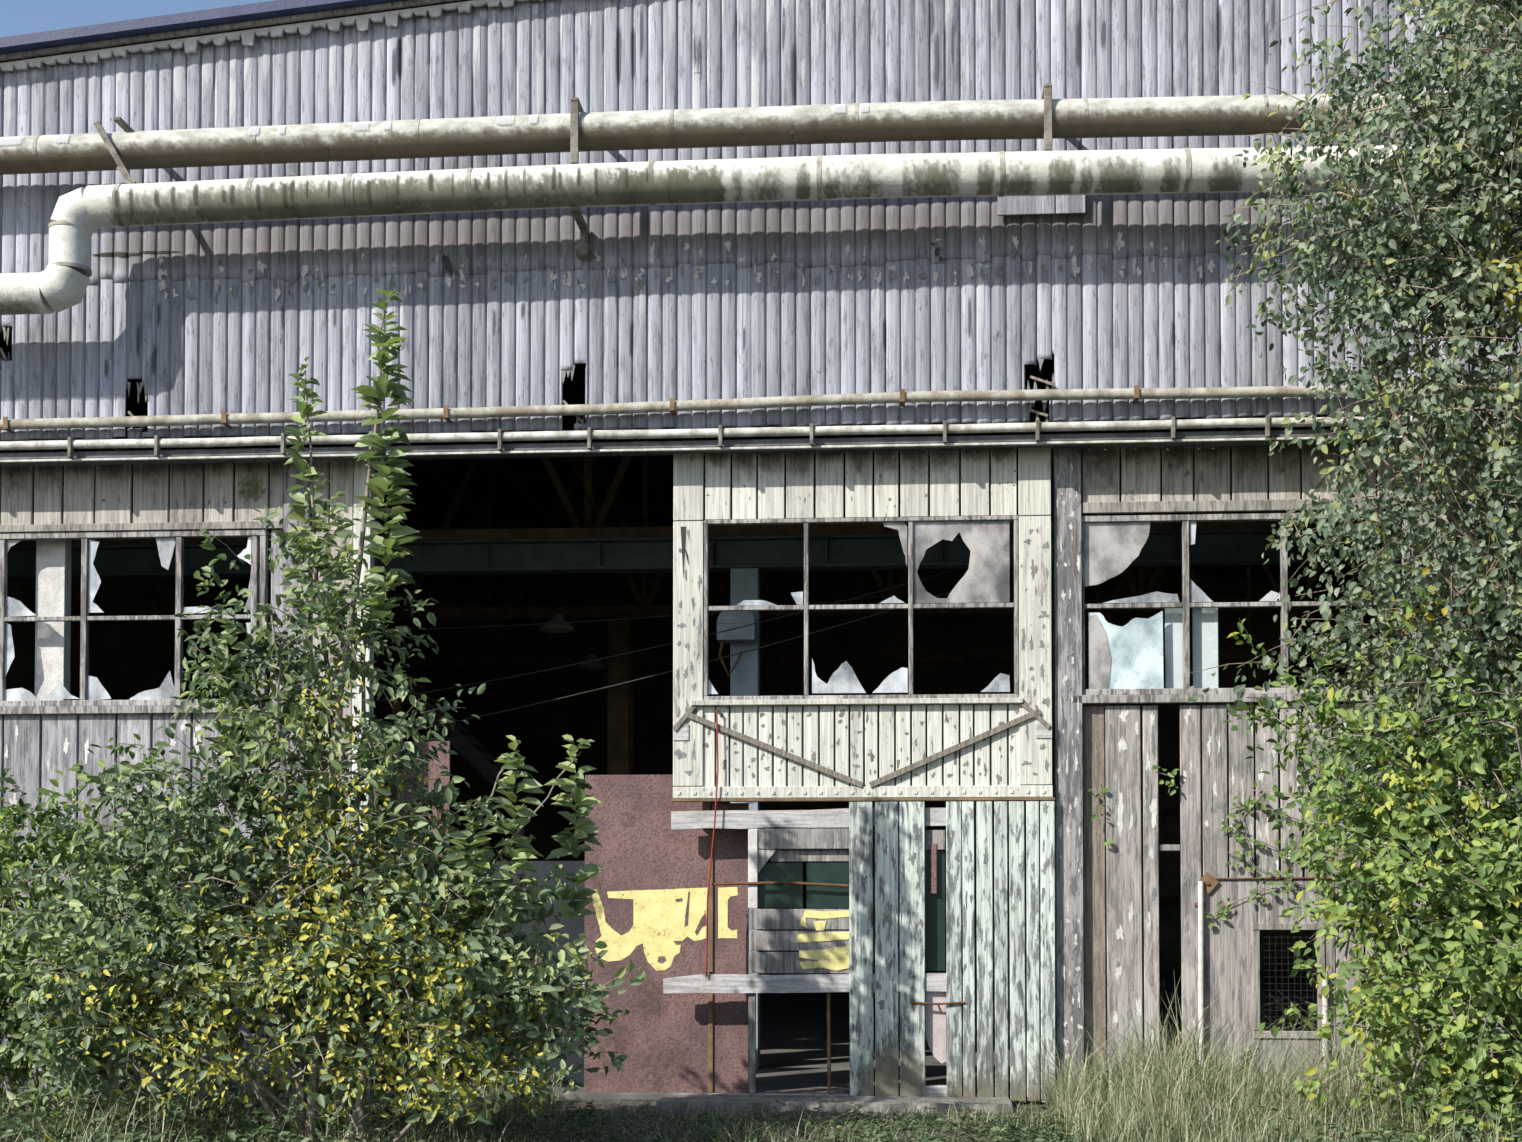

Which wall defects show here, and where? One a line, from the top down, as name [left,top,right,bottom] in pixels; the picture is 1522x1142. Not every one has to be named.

damp [902,163,958,196]
damp [977,156,1141,195]
damp [1160,160,1179,192]
damp [1209,160,1240,192]
peeling [158,229,1234,304]
peeling [674,530,816,778]
peeling [837,450,1091,785]
peeling [1109,710,1157,837]
peeling [1205,711,1324,877]
peeling [850,802,924,1094]
peeling [947,794,1083,1091]
peeling [1113,961,1156,1052]